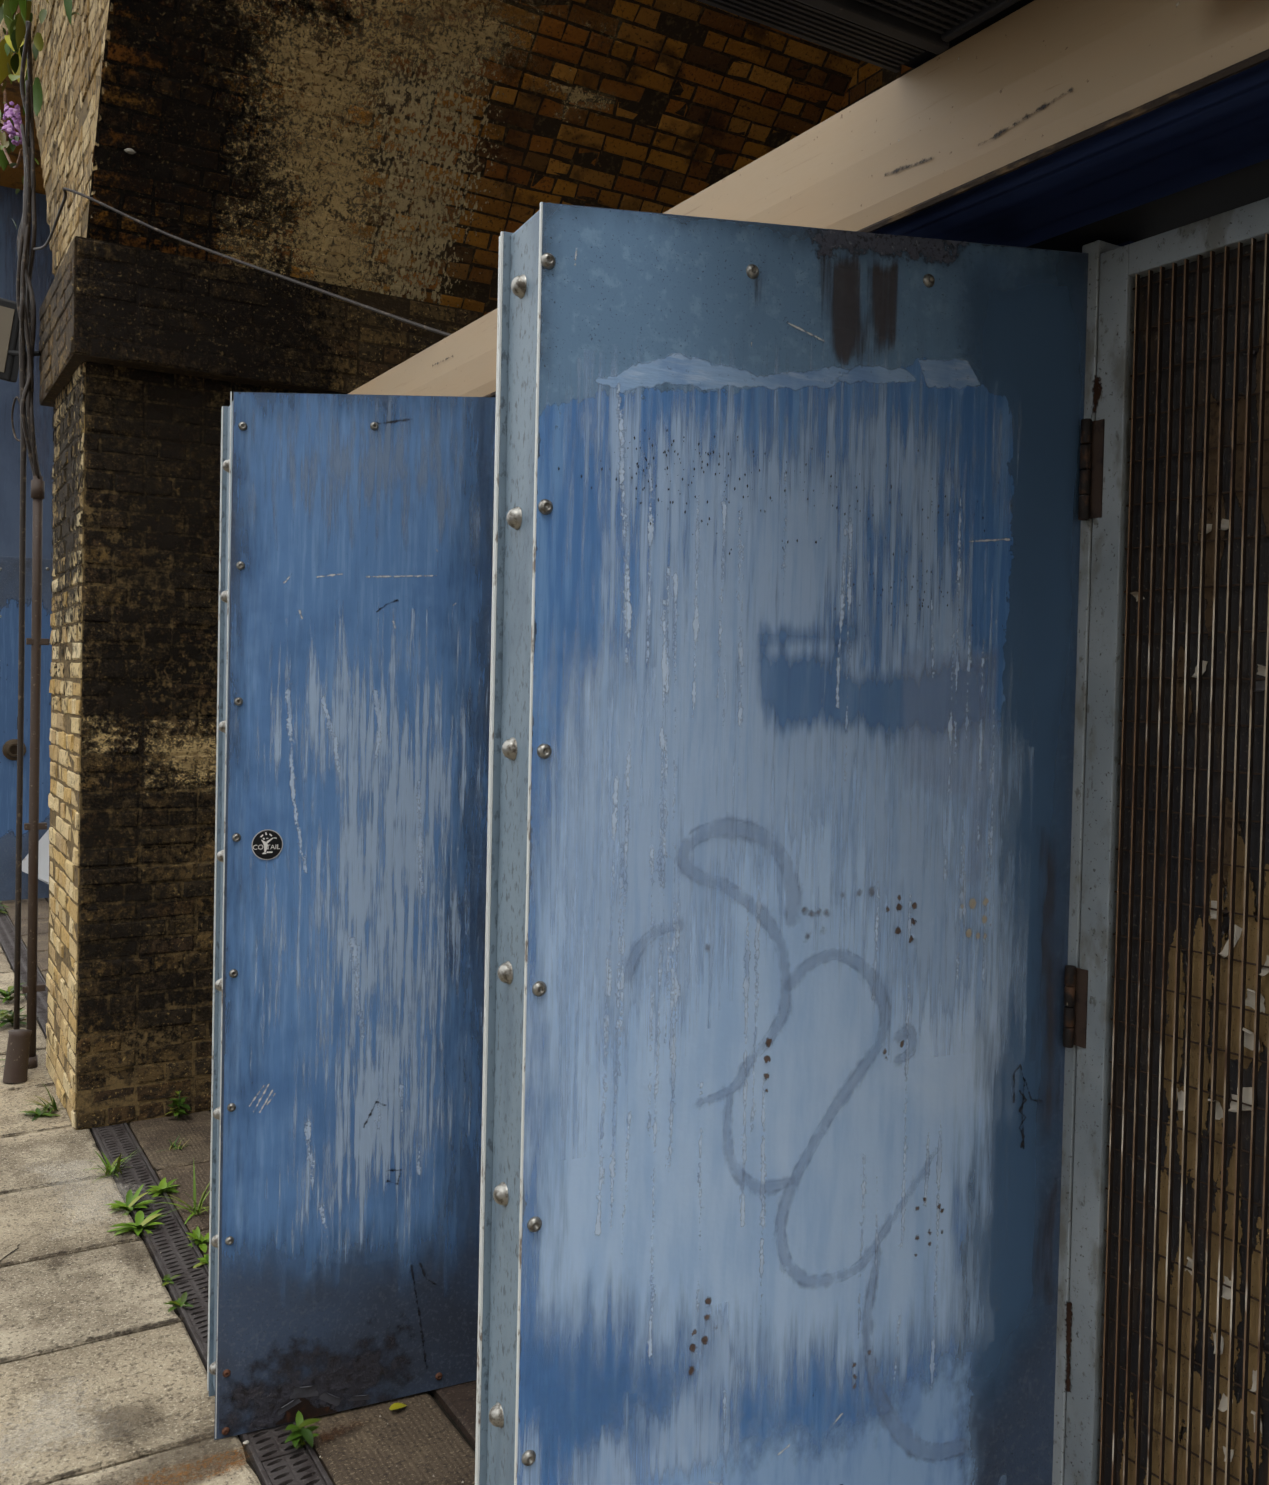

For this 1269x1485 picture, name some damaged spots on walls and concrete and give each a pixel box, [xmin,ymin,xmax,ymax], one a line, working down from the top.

damp [215,0,535,306]
corrosion [688,1298,717,1375]